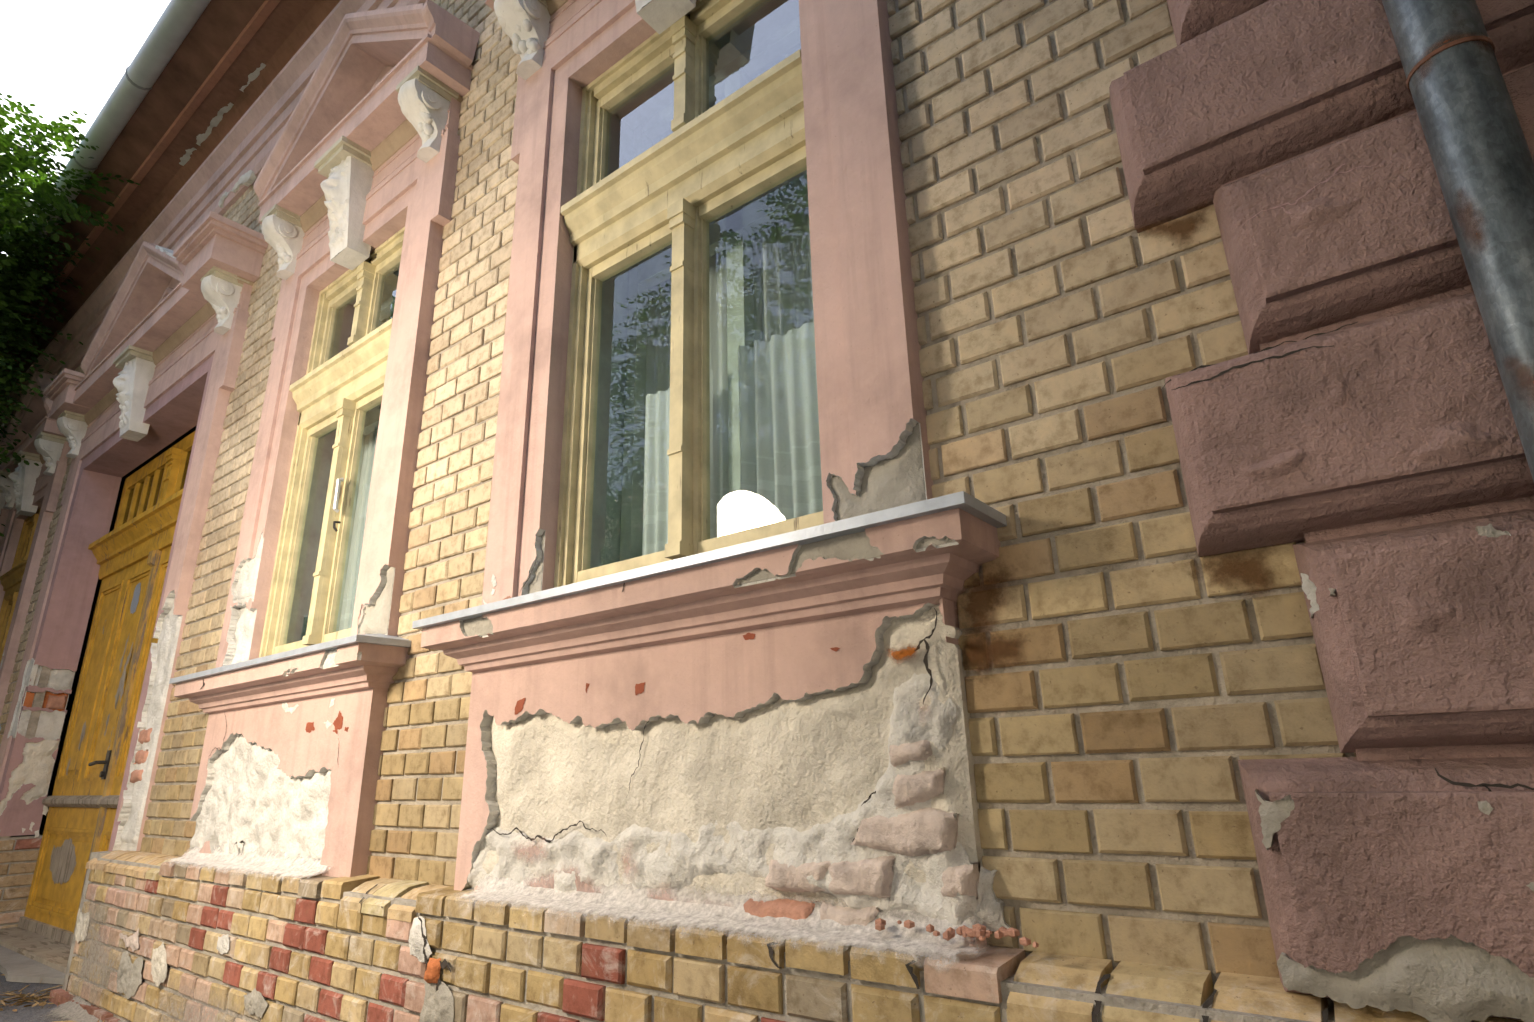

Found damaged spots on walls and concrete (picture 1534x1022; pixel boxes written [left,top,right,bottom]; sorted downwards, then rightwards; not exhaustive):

water stain [1140,207,1204,240]
crack [1162,322,1357,390]
flaking render [736,423,926,585]
water stain [1203,553,1271,590]
crack [915,608,937,704]
water stain [961,571,1019,669]
flaking render [0,658,86,838]
flaking render [190,735,332,860]
flaking render [467,604,1011,928]
crack [1435,768,1534,792]
crack [1092,974,1111,1022]
flaking render [1277,934,1534,1022]